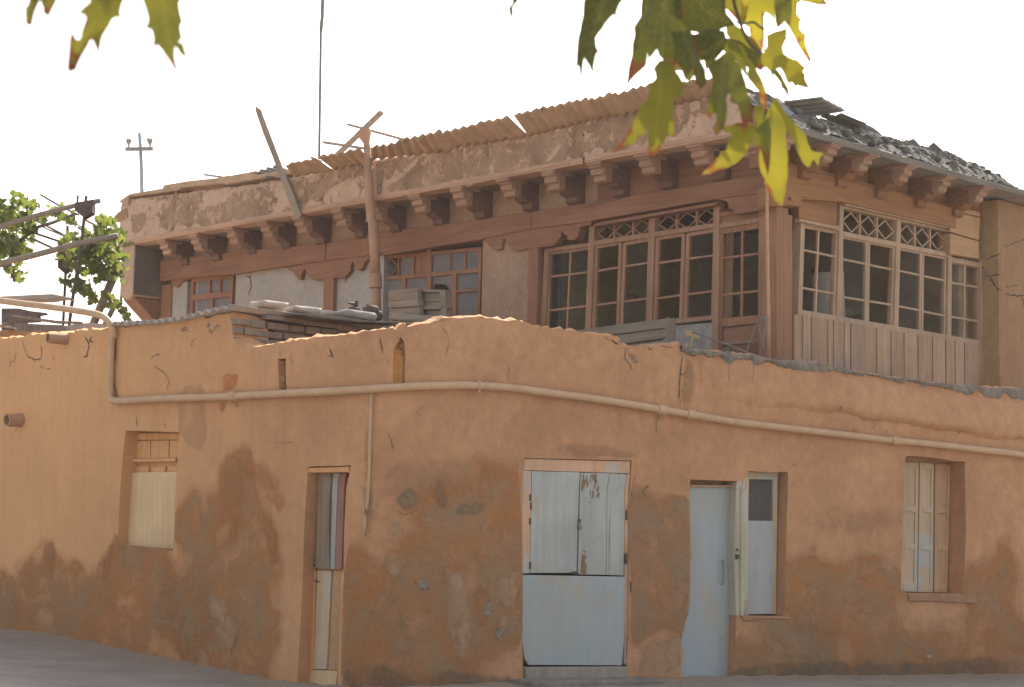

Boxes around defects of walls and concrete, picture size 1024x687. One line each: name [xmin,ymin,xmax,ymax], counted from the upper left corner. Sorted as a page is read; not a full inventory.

peeling [667,97,710,137]
peeling [130,213,145,233]
peeling [159,187,278,231]
peeling [289,164,363,208]
peeling [382,112,649,195]
crack [987,239,1024,304]
crack [603,335,714,407]
damp [0,450,283,679]
damp [341,466,523,687]
damp [629,492,692,677]
damp [731,546,1024,676]